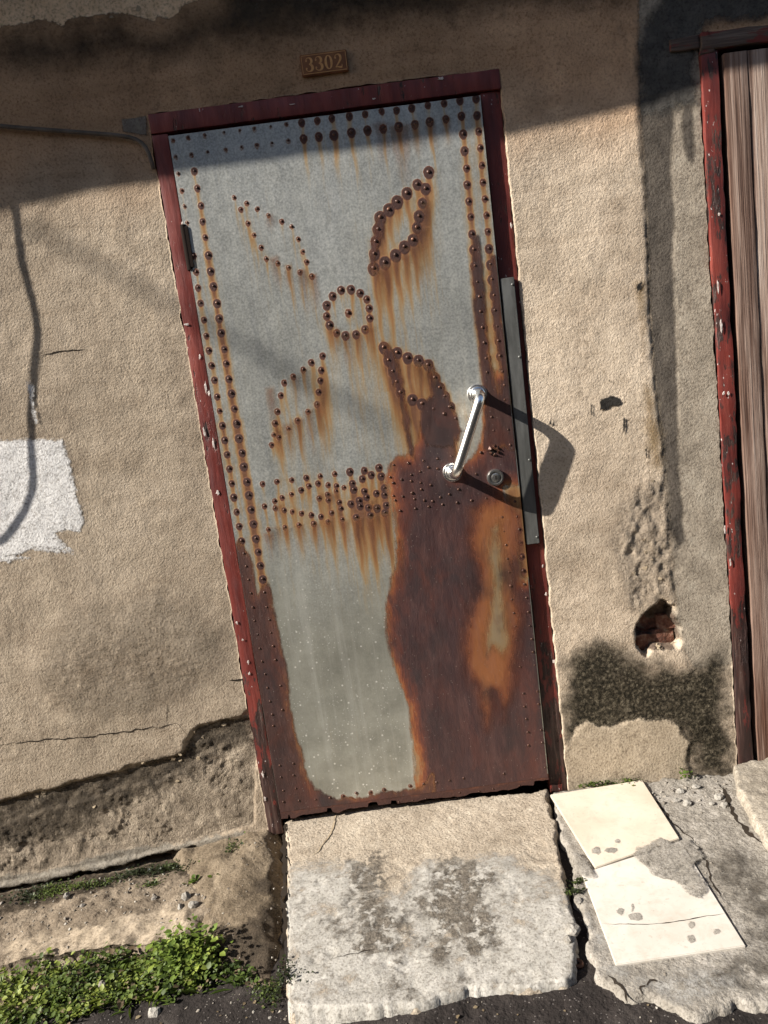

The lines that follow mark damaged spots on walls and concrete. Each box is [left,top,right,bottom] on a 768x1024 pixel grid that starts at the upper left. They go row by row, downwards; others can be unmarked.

corrosion [370,214,384,274]
corrosion [236,234,548,812]
flaking render [613,480,680,650]
crack [5,712,179,745]
water stain [560,641,735,776]